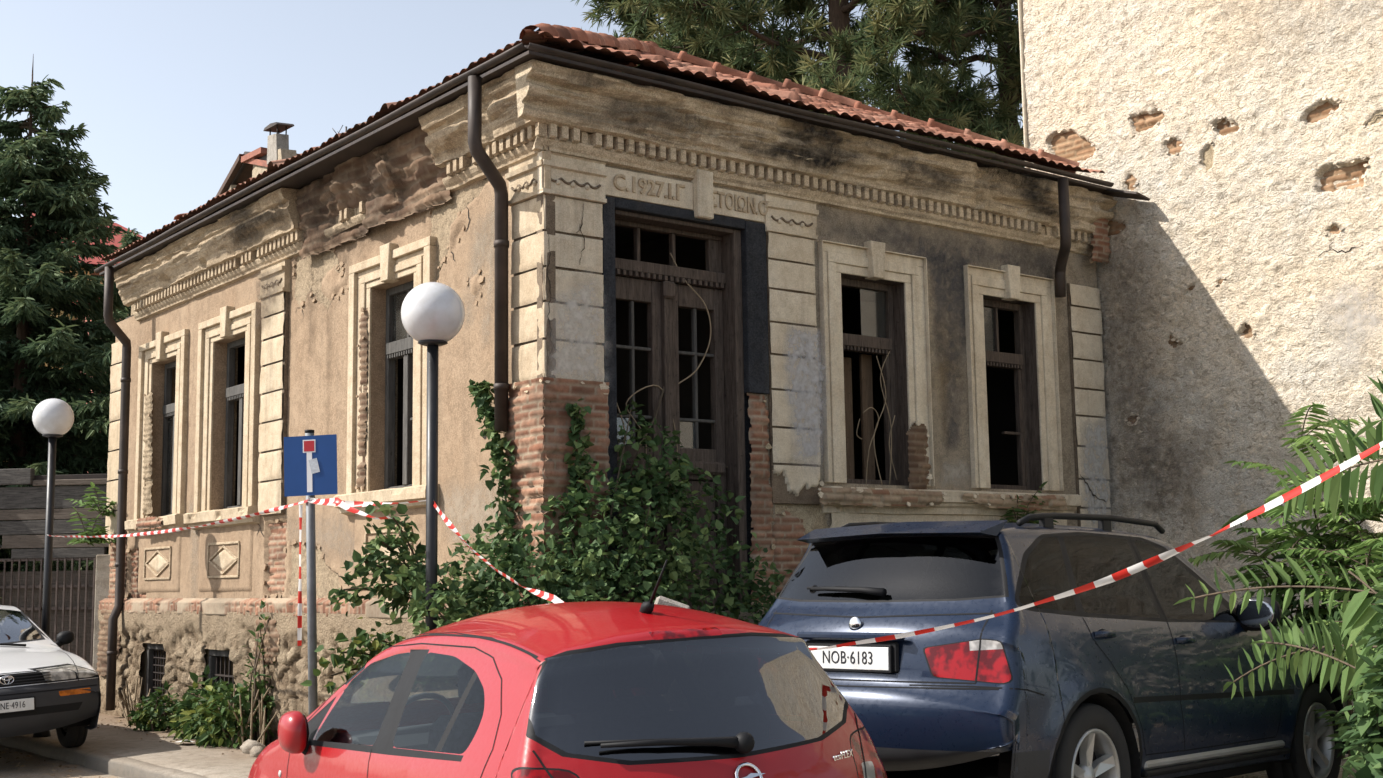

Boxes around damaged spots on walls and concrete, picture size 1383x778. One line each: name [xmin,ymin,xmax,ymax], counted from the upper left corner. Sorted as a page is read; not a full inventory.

spalling [1051,130,1098,162]
spalling [1126,108,1183,155]
spalling [1198,116,1239,172]
spalling [1303,96,1341,123]
peeling [1361,110,1383,127]
spalling [1320,155,1369,192]
flaking render [505,377,610,601]
flaking render [747,393,1068,605]